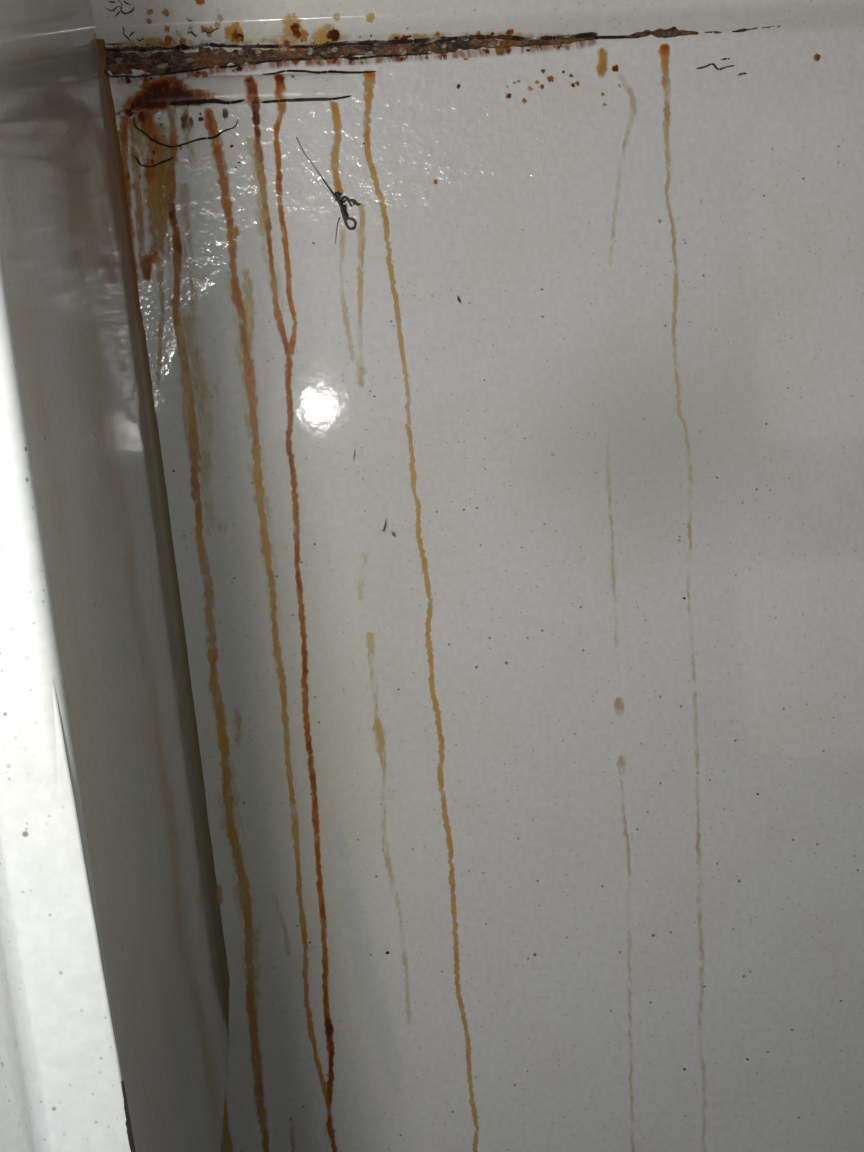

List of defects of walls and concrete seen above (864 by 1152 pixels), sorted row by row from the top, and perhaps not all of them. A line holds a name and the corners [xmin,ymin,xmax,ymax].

crack [104,0,639,167]
corrosion [389,32,444,40]
corrosion [476,29,514,54]
corrosion [506,69,579,103]
corrosion [597,48,621,88]
corrosion [659,44,678,341]
corrosion [343,204,365,334]
corrosion [675,372,686,429]
corrosion [114,9,354,1152]
corrosion [363,72,479,1152]